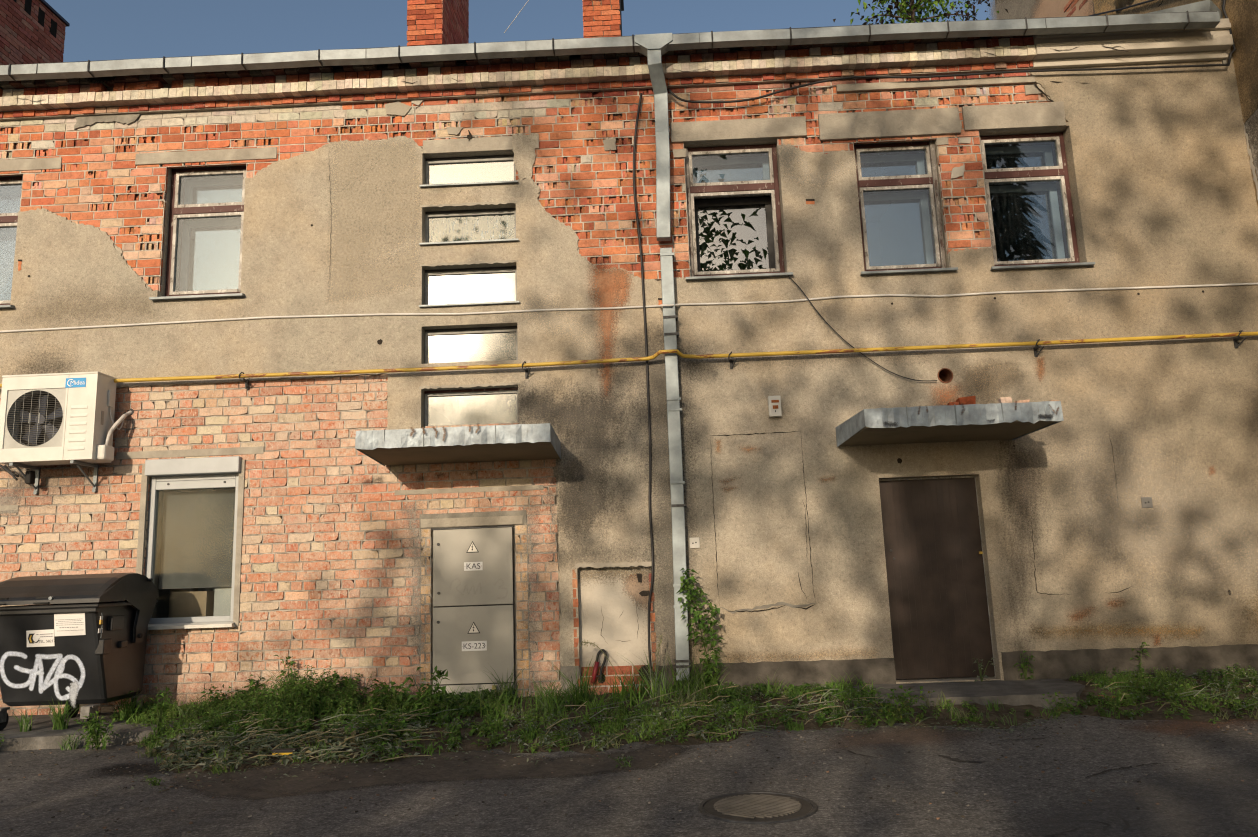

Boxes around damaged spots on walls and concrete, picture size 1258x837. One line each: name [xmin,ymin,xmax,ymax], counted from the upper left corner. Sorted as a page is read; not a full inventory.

peeling [1064,0,1088,17]
peeling [0,72,1050,292]
corrosion [591,266,629,396]
damp [515,392,633,537]
damp [578,339,696,666]
crack [711,431,816,614]
spalling [560,561,656,695]